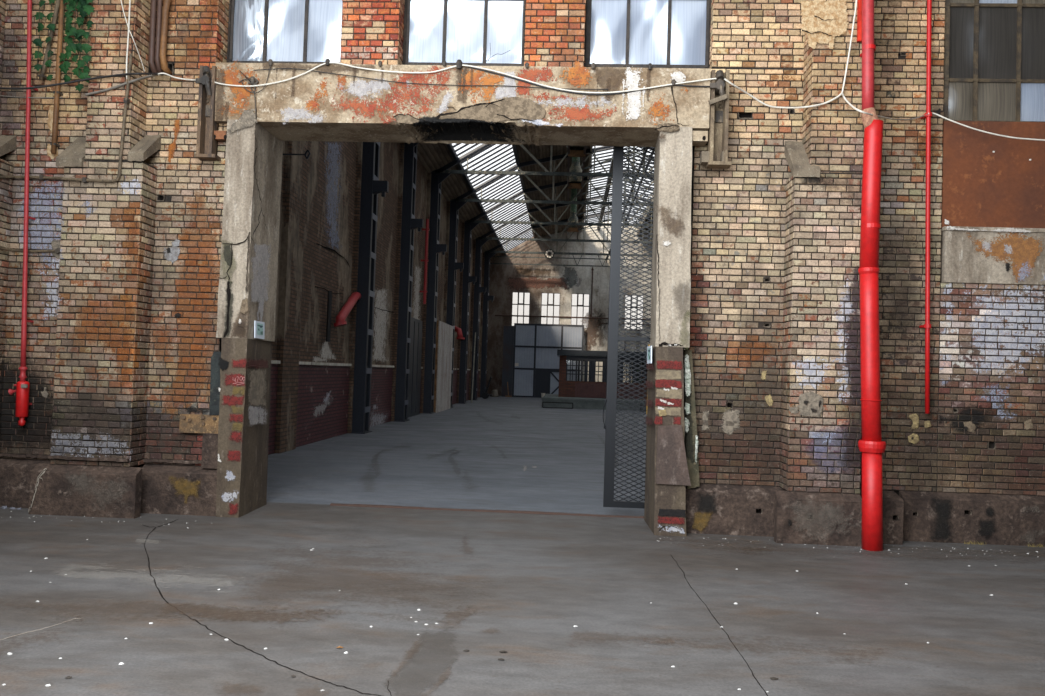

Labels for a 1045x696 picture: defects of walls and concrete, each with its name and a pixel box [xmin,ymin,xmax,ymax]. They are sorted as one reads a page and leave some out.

spalling [800,0,849,49]
spalling [305,61,617,143]
peeling [646,94,680,132]
spalling [238,233,250,328]
peeling [967,232,1043,283]
water stain [0,361,133,457]
crack [142,519,391,696]
crack [671,555,768,696]